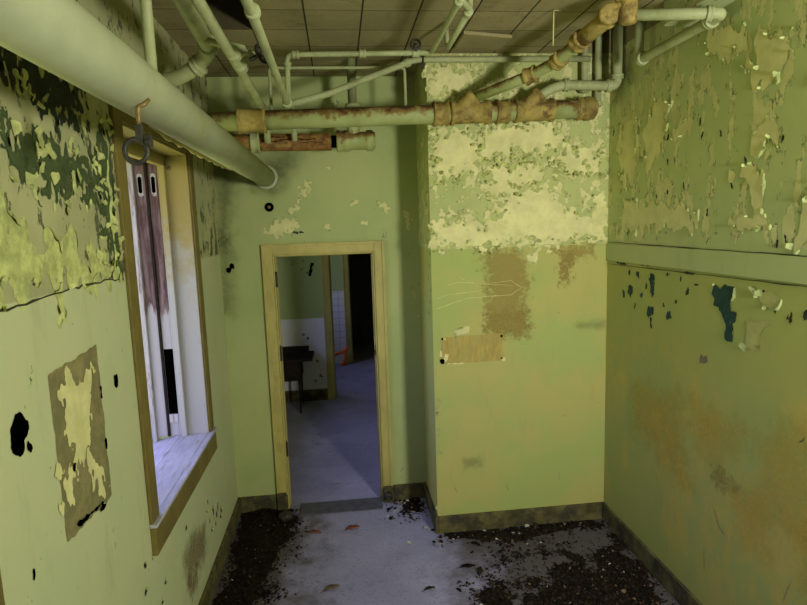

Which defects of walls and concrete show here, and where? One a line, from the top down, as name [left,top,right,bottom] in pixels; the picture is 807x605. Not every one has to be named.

peeling [704,21,798,93]
peeling [0,46,125,328]
peeling [263,178,312,239]
peeling [427,119,609,265]
peeling [613,96,708,237]
peeling [728,113,784,234]
peeling [776,185,807,255]
leakage [484,248,530,337]
spalling [617,262,677,328]
spalling [712,283,782,352]
peeling [48,345,112,542]